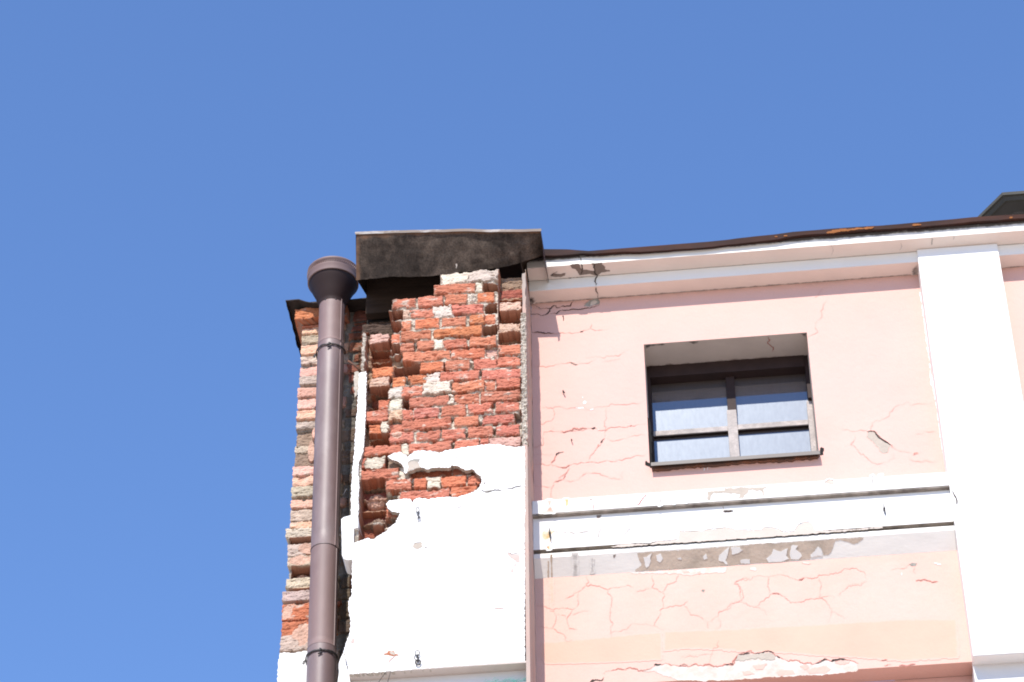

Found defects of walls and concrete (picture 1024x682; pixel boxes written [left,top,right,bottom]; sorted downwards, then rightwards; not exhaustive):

peeling [551,262,610,277]
crack [527,256,604,334]
spalling [407,459,420,472]
crack [457,403,646,508]
spalling [867,430,894,453]
crack [843,403,936,464]
peeling [631,537,863,576]
crack [540,568,866,682]
spalling [644,652,858,682]